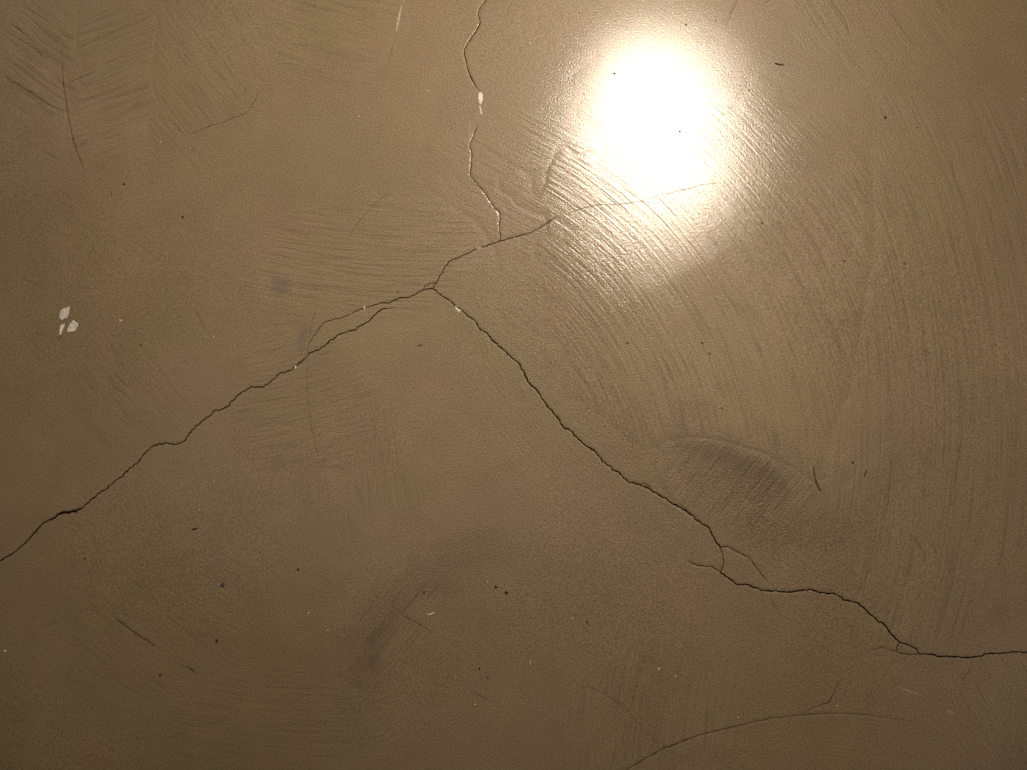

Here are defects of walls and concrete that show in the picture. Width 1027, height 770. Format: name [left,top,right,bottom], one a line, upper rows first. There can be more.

crack [464,0,486,89]
crack [61,48,85,172]
crack [0,125,1027,659]